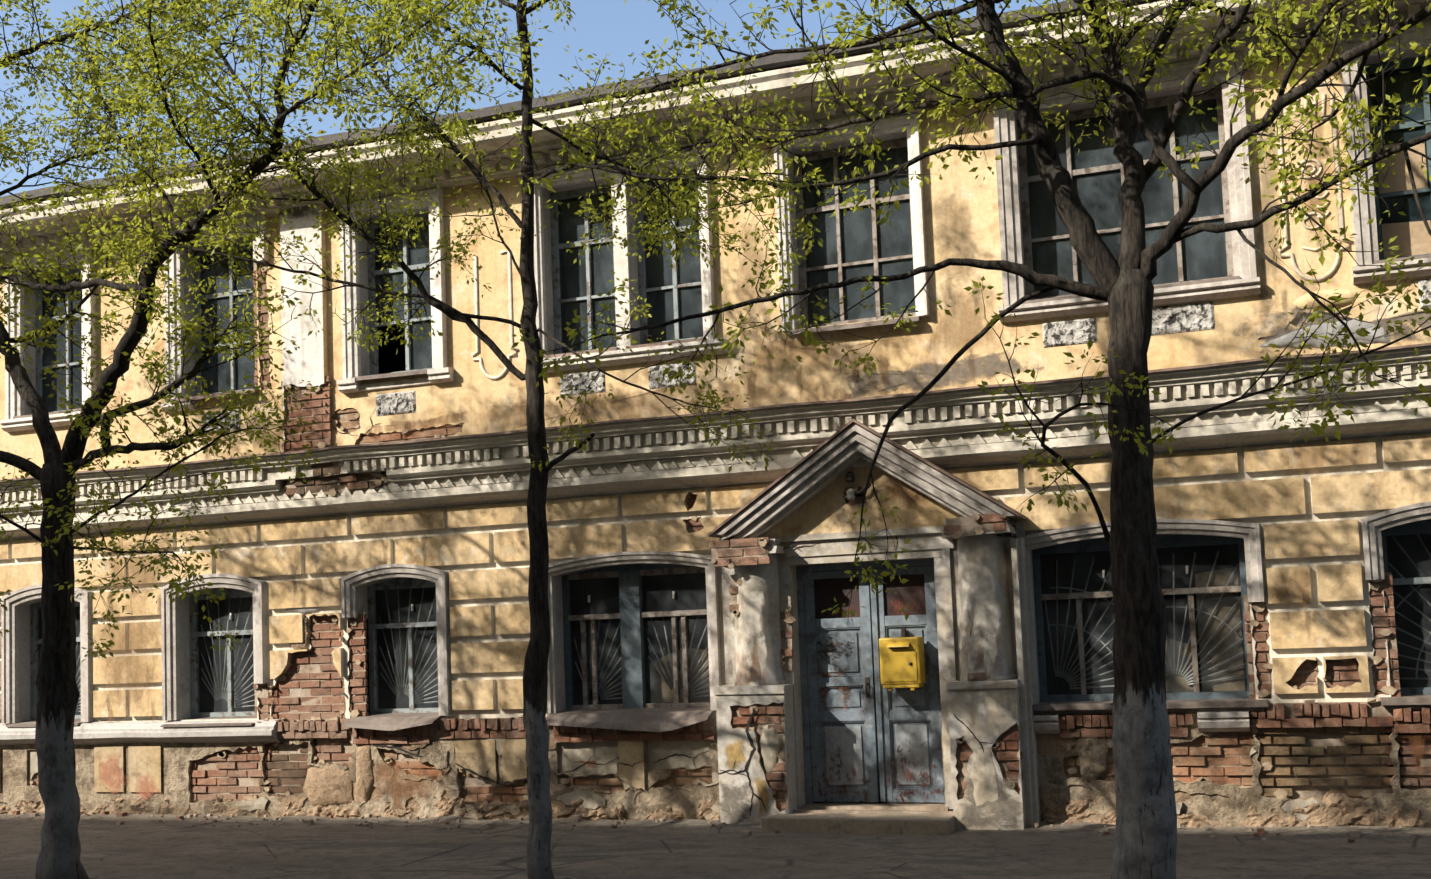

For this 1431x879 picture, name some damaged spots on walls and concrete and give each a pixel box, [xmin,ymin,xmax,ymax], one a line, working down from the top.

flaking render [253,262,465,452]
flaking render [685,493,771,615]
flaking render [190,606,369,803]
crack [373,745,526,785]
crack [563,708,766,816]
crack [954,714,993,753]
flaking render [1063,747,1115,782]
flaking render [1171,572,1431,801]